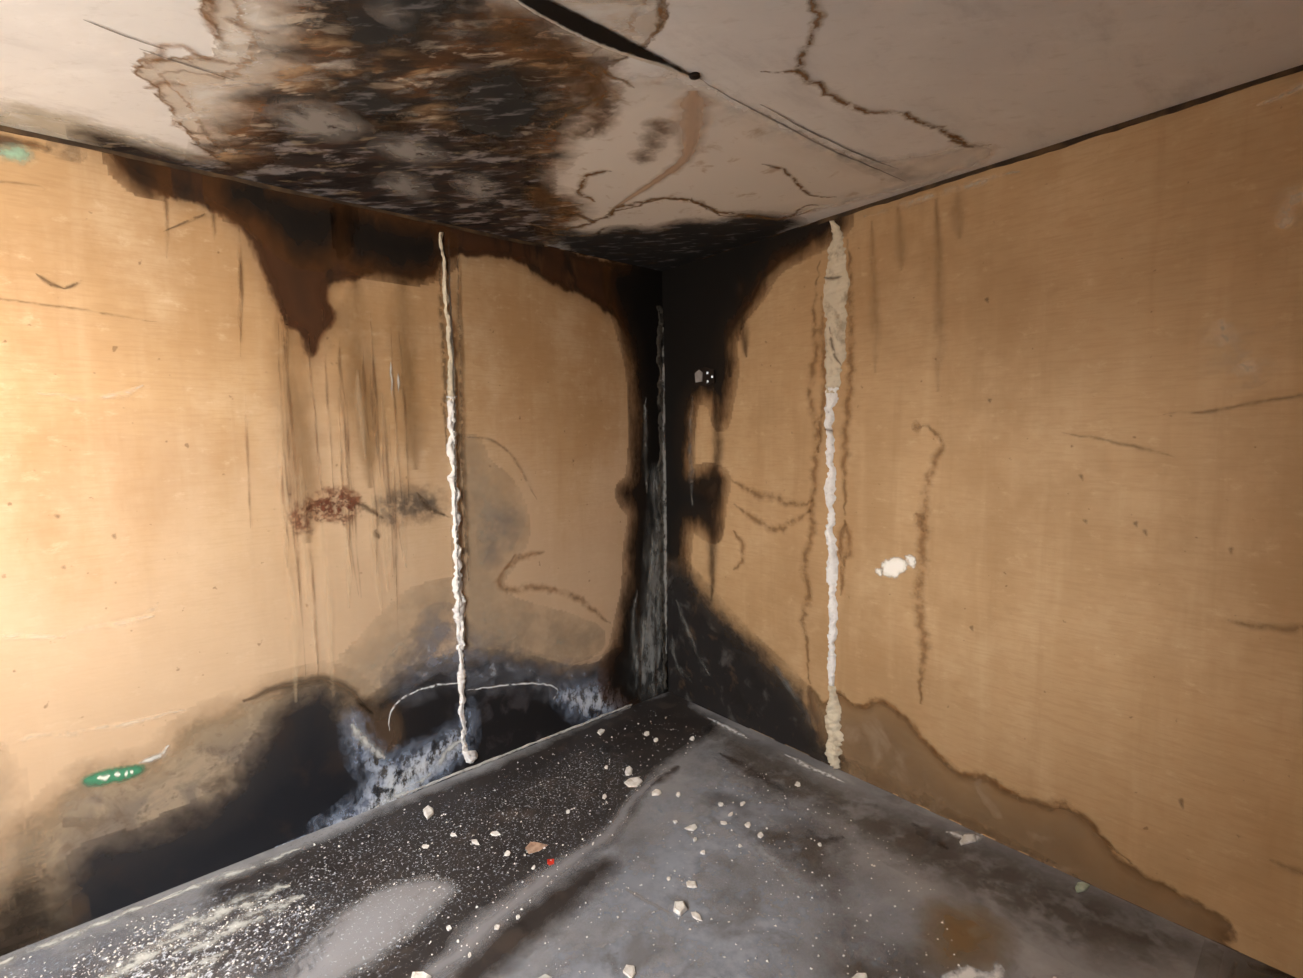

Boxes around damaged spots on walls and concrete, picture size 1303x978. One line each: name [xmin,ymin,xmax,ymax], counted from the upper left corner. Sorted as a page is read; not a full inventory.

corrosion [292,487,383,538]
crack [439,253,469,575]
damp [0,0,983,978]
damp [836,691,1238,958]